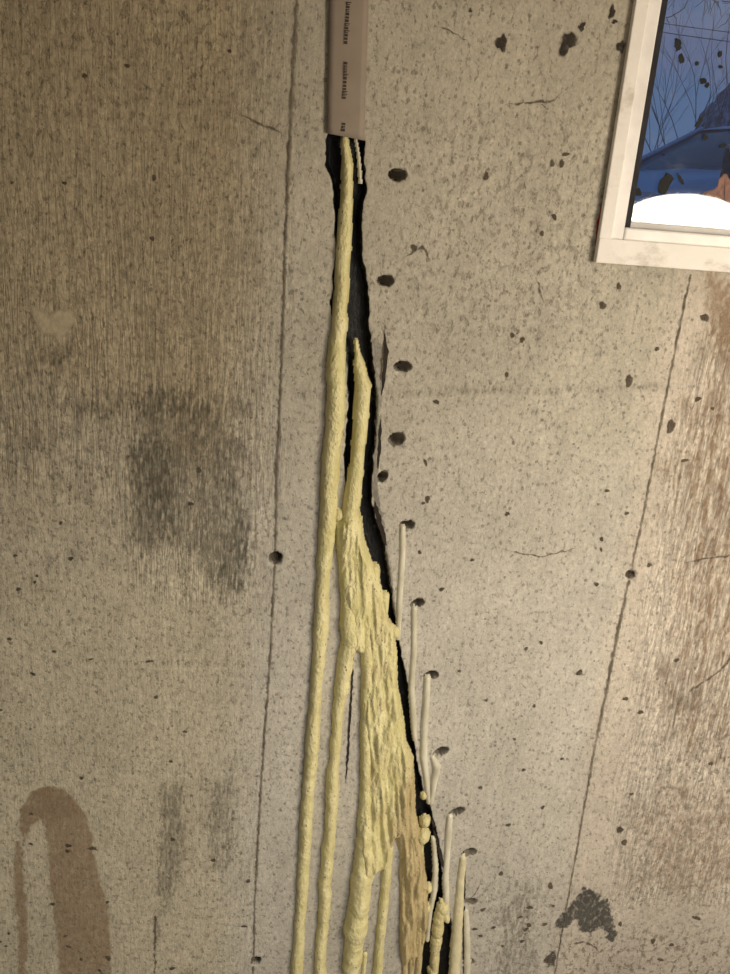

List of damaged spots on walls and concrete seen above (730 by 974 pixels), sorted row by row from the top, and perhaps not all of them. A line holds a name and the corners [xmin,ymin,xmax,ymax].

crack [325,134,479,974]
water stain [21,789,110,974]
water stain [556,887,617,942]